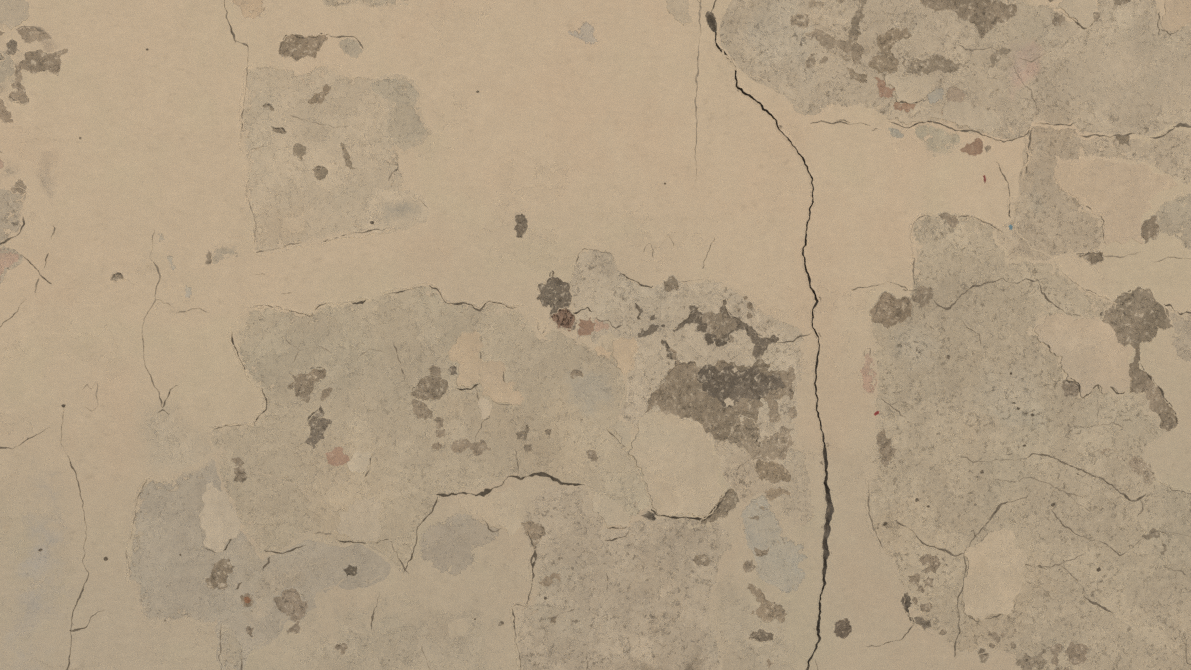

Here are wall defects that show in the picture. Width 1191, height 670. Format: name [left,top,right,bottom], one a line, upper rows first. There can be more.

peeling [0,178,30,248]
crack [0,382,104,670]
crack [142,230,206,415]
peeling [204,33,432,267]
peeling [121,246,816,670]
crack [391,449,584,573]
crack [695,0,1191,670]
peeling [780,0,1191,670]